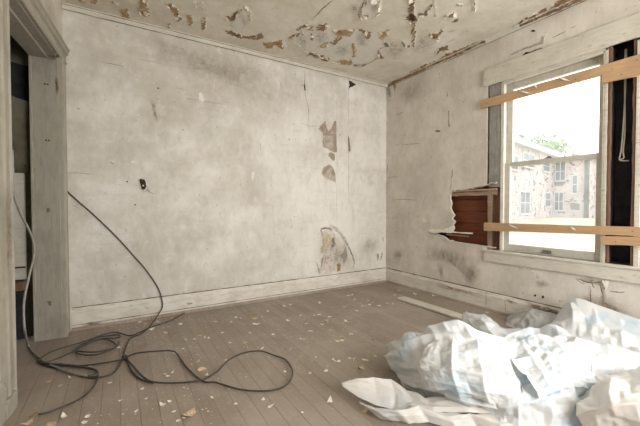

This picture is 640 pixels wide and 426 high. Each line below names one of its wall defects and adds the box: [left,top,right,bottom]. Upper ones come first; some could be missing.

peeling [117,0,152,21]
peeling [164,2,208,31]
peeling [223,0,478,67]
peeling [510,0,583,56]
flaking render [318,120,338,183]
flaking render [138,177,153,194]
flaking render [422,182,500,250]